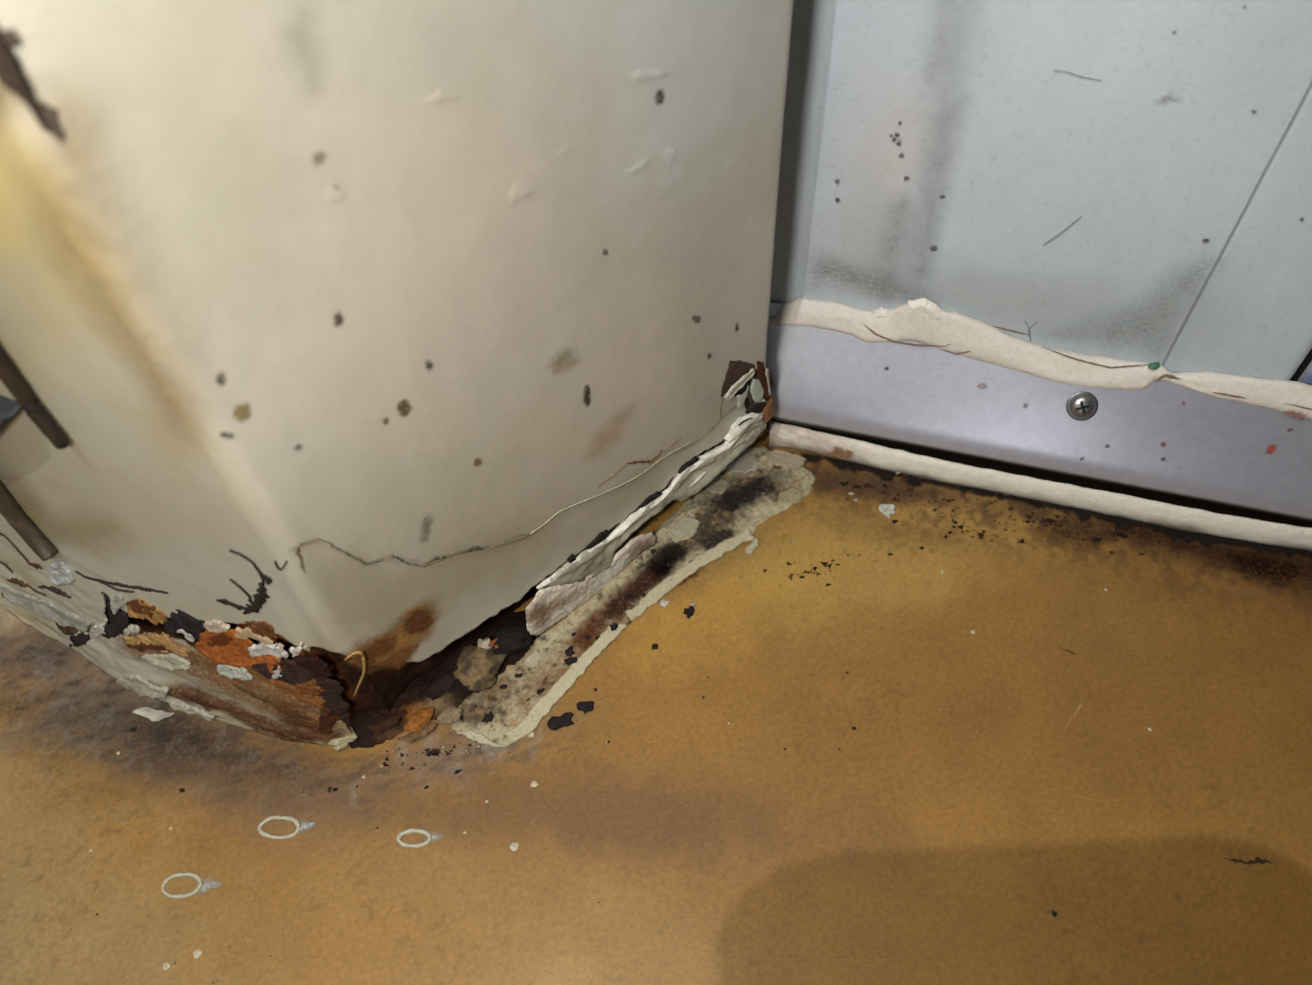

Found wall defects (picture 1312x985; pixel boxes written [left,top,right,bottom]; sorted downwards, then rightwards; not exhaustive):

spalling [0,28,65,144]
peeling [48,561,75,586]
rust [55,622,78,636]
peeling [0,583,217,721]
peeling [216,664,254,681]
rust [105,548,587,744]
crack [216,396,738,614]
peeling [451,368,815,748]